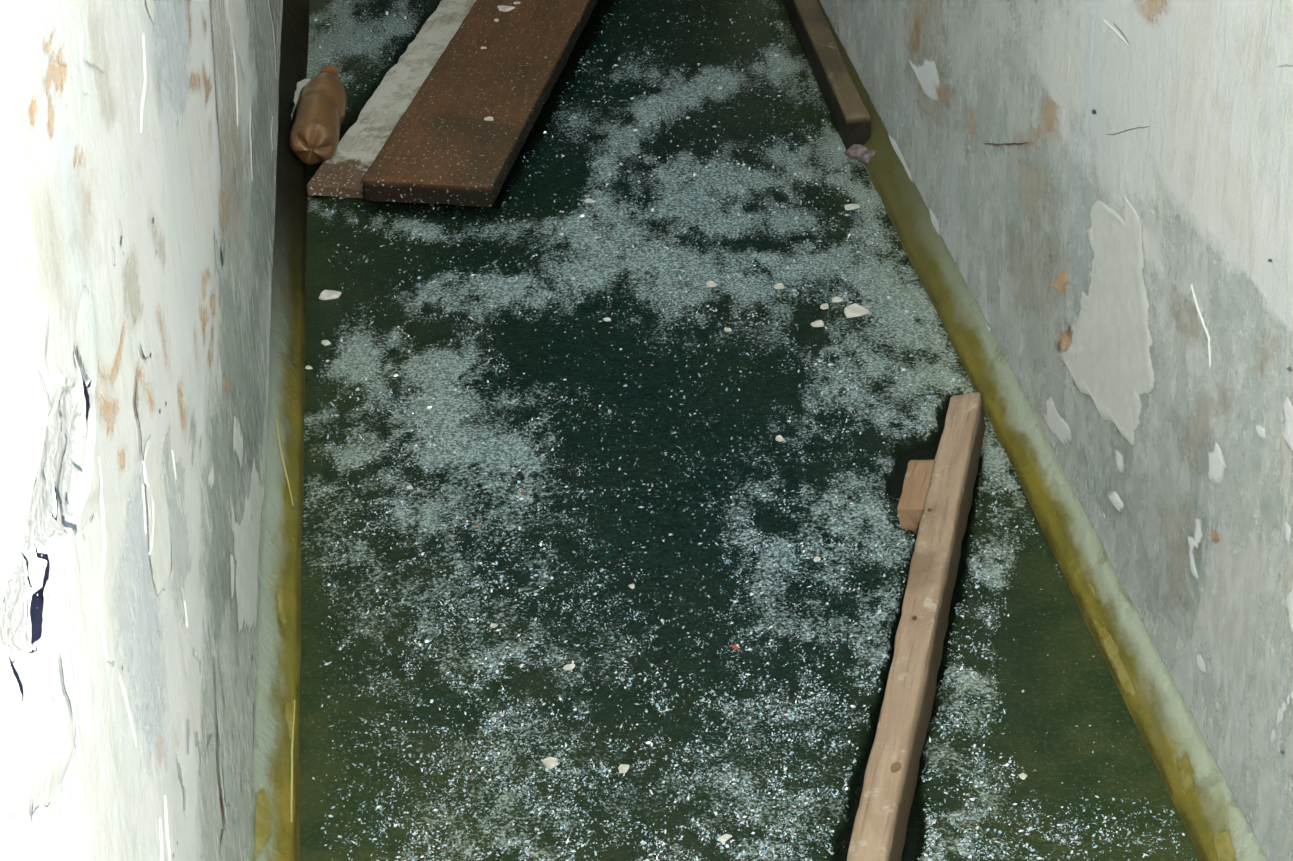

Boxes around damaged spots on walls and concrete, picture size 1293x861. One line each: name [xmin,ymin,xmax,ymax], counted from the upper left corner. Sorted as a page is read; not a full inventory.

corrosion [29,32,65,136]
spalling [73,346,89,383]
corrosion [99,327,125,378]
corrosion [201,273,215,360]
peeling [1059,193,1155,473]
water stain [193,0,280,861]
peeling [1043,396,1072,447]
water stain [1107,247,1293,638]
peeling [1207,441,1227,485]
spalling [0,385,82,651]
peeling [1188,519,1203,579]
water stain [1213,830,1235,861]